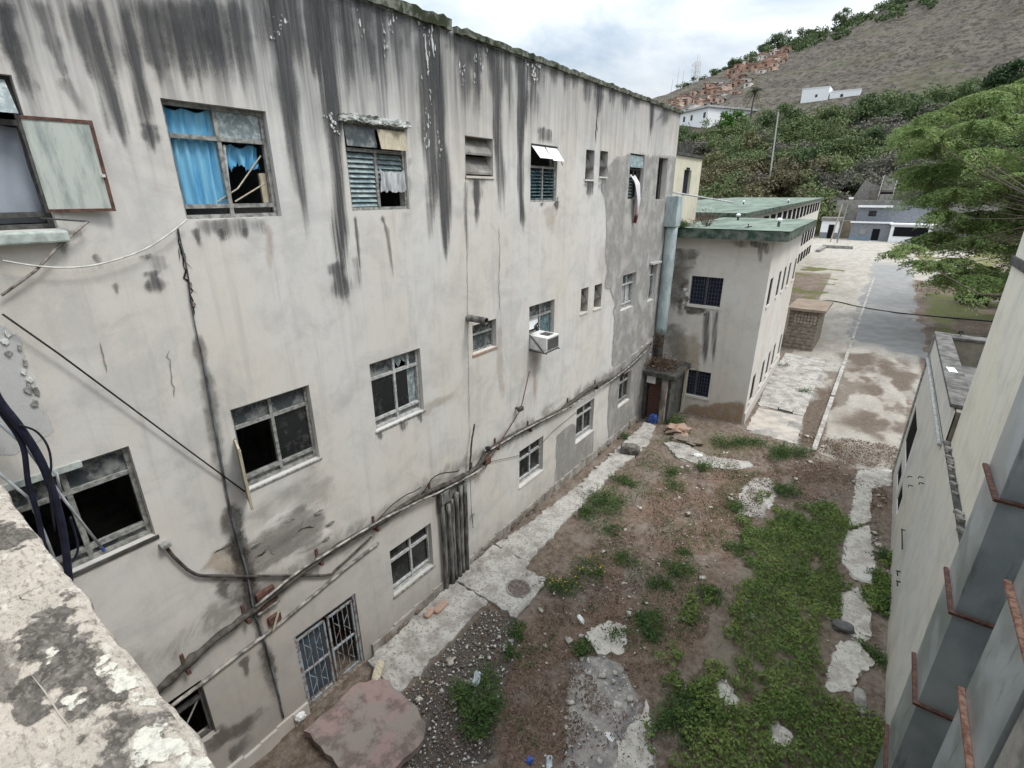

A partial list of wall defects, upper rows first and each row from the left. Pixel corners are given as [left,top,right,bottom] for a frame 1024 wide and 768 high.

damp [0,1,31,89]
damp [70,1,125,142]
damp [122,0,251,148]
peeling [417,21,442,152]
damp [270,0,540,296]
peeling [0,417,21,455]
peeling [0,326,54,442]
damp [145,271,163,290]
damp [194,218,247,243]
damp [703,312,718,359]
damp [221,506,335,611]
damp [0,592,176,768]